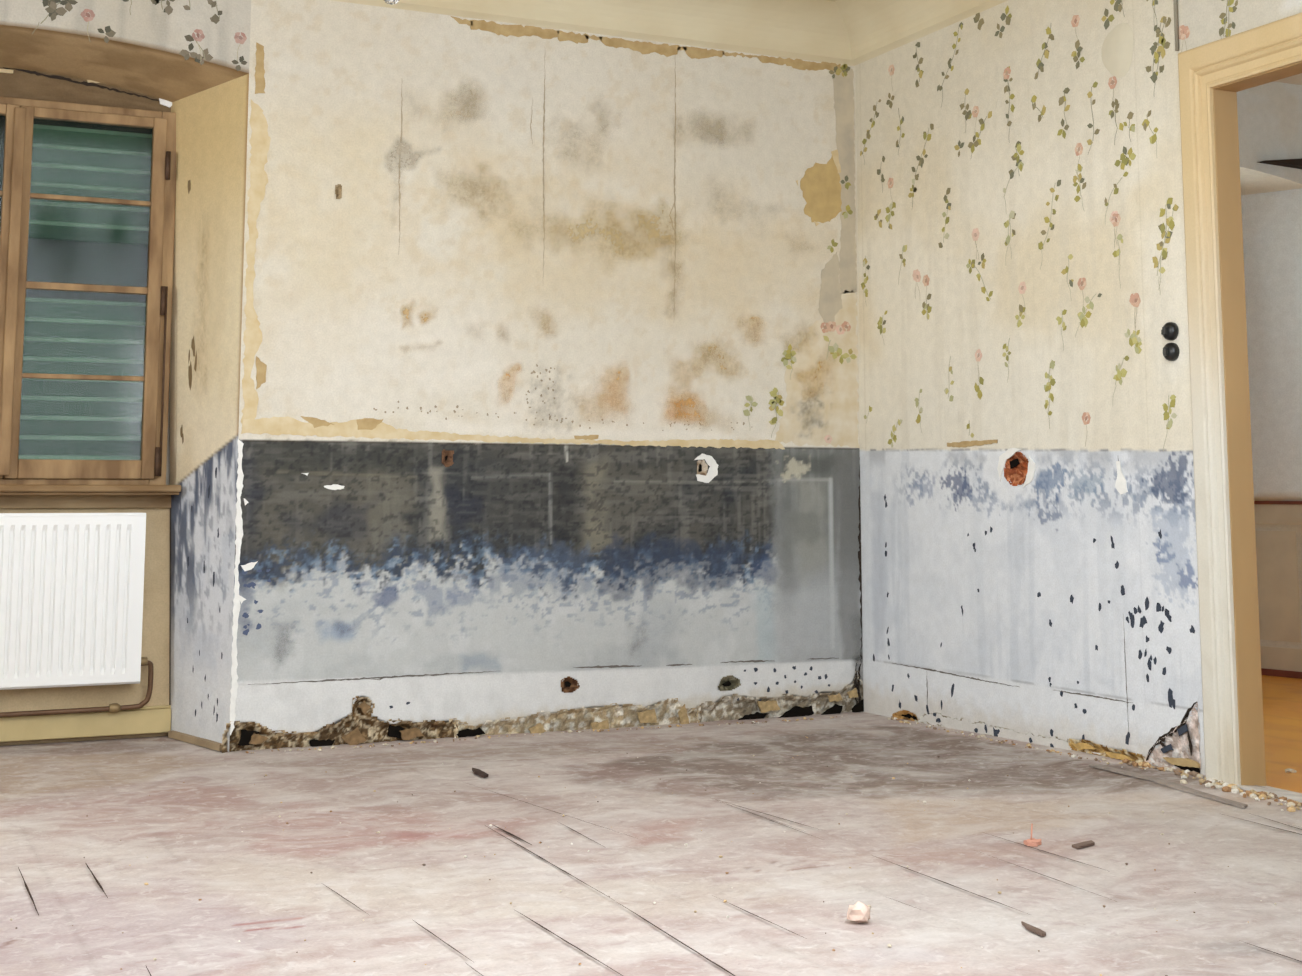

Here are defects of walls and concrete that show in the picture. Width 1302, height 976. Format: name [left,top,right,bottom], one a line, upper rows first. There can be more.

peeling [451,16,841,71]
leakage [373,364,644,429]
peeling [193,42,864,753]
peeling [947,440,1036,488]
spalling [892,585,1201,774]